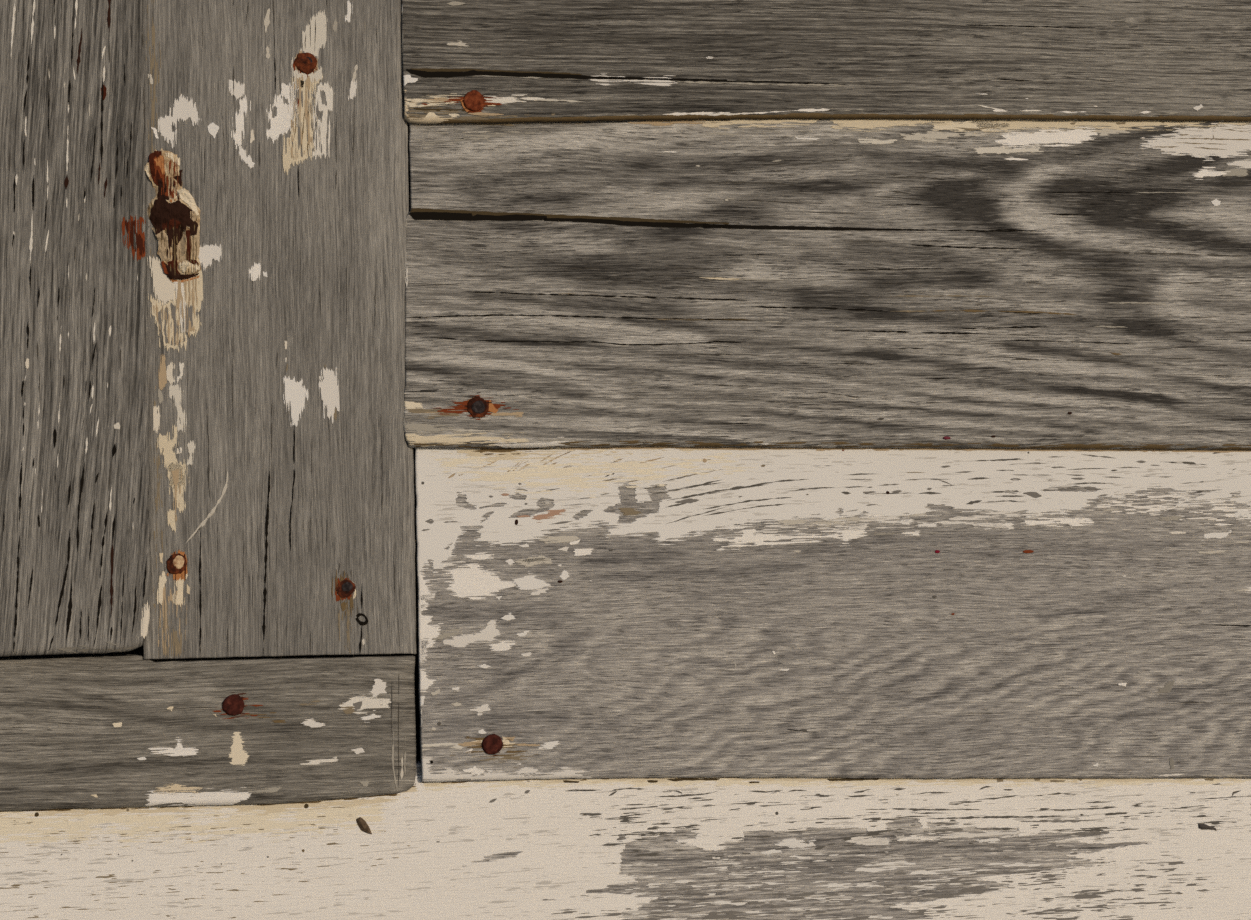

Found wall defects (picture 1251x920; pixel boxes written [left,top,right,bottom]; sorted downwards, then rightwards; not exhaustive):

corrosion [410,96,504,116]
peeling [622,93,1251,180]
corrosion [122,151,200,345]
peeling [137,0,358,531]
corrosion [407,392,524,420]
corrosion [158,550,188,656]
corrosion [332,570,356,618]
peeling [0,401,1251,920]
corrosion [450,732,540,768]